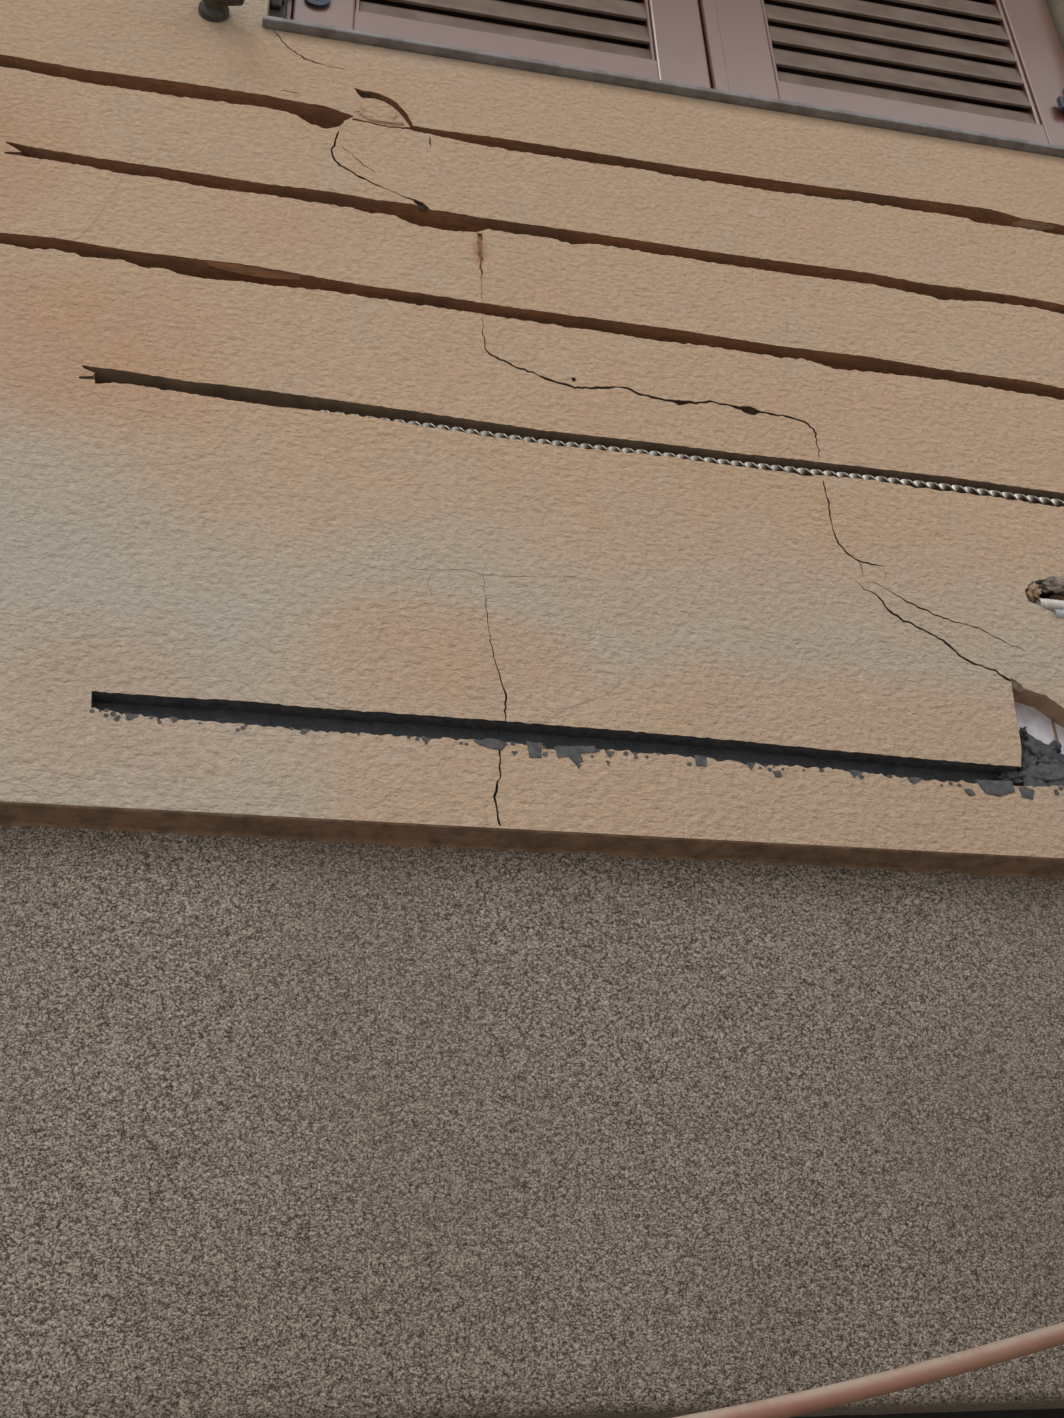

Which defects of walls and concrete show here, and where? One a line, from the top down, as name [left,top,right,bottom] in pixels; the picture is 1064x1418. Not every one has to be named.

crack [273,30,342,69]
crack [331,131,429,212]
crack [477,233,1027,681]
crack [410,567,599,826]
flaking render [996,678,1064,787]